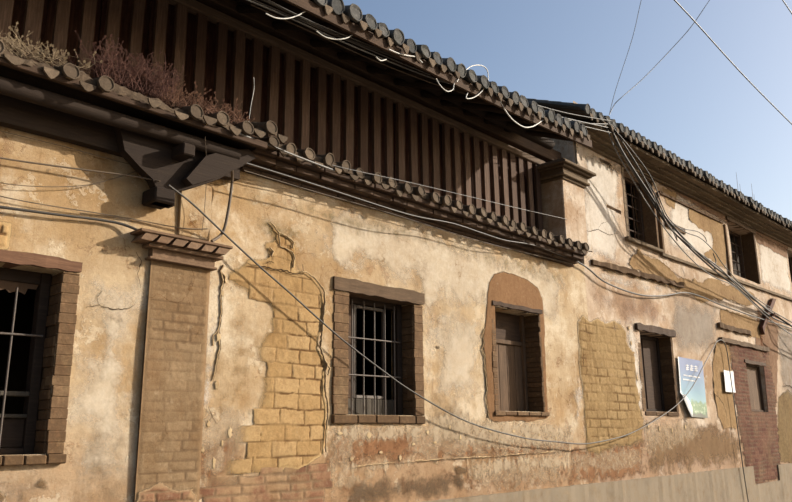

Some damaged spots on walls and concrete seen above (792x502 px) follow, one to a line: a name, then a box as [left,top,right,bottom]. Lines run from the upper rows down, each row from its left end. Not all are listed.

spalling [0,221,12,250]
spalling [688,204,726,269]
crack [88,252,142,310]
spalling [137,222,694,502]
spalling [628,248,792,484]
water stain [650,425,741,474]
water stain [351,476,463,502]